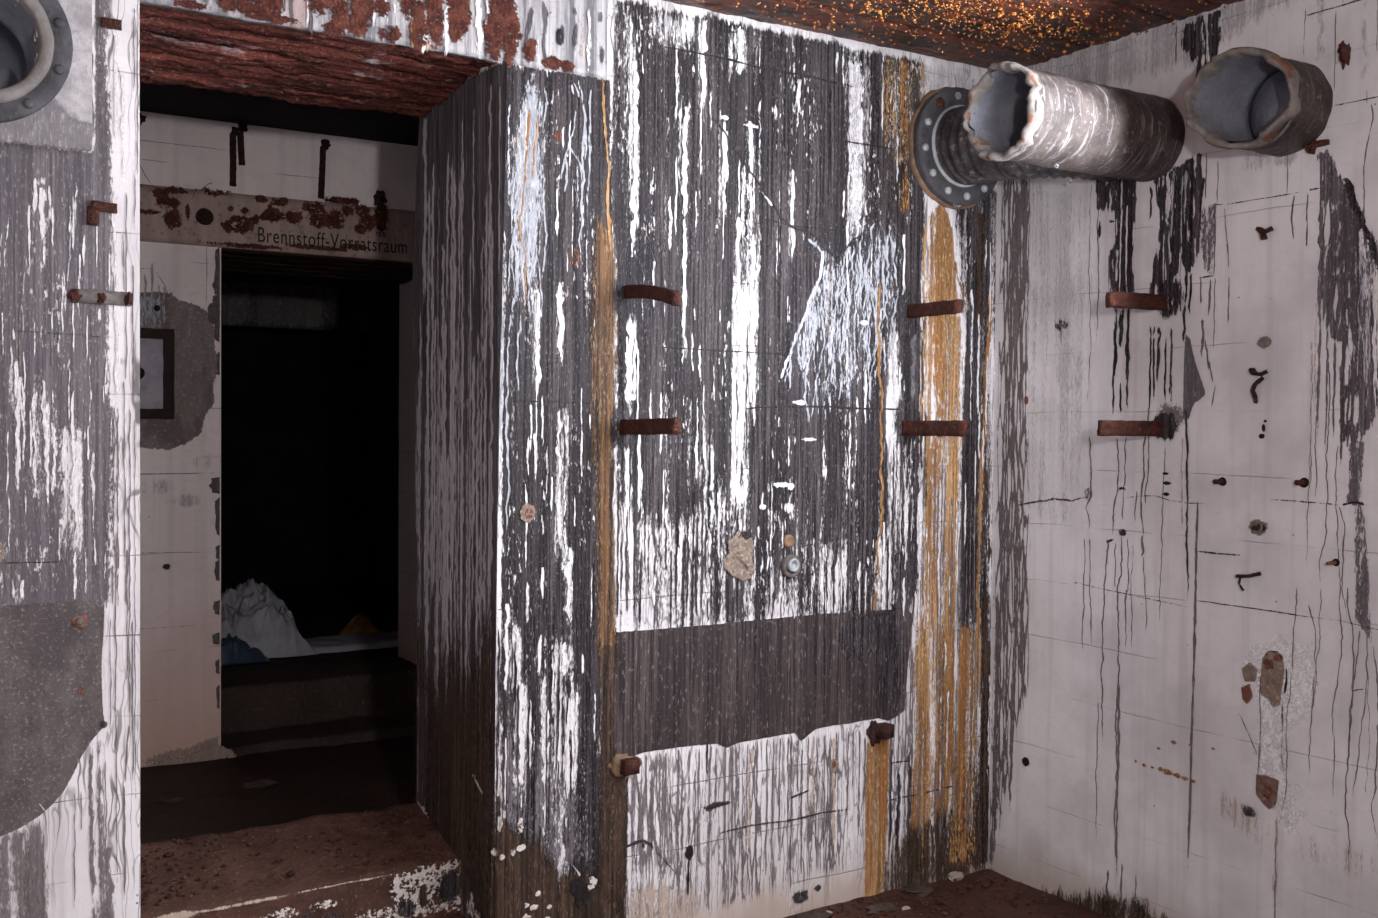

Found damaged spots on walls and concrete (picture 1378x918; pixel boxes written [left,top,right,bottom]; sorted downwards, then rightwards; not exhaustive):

water stain [282,0,313,34]
rust [174,0,575,72]
rust [140,185,389,252]
water stain [0,0,218,918]
water stain [411,0,1030,918]
rust [873,281,885,610]
rust [910,205,992,866]
water stain [1042,153,1230,918]
water stain [1246,105,1378,918]
peeling [0,601,108,836]
rust [864,739,890,897]
spalling [1241,651,1287,817]